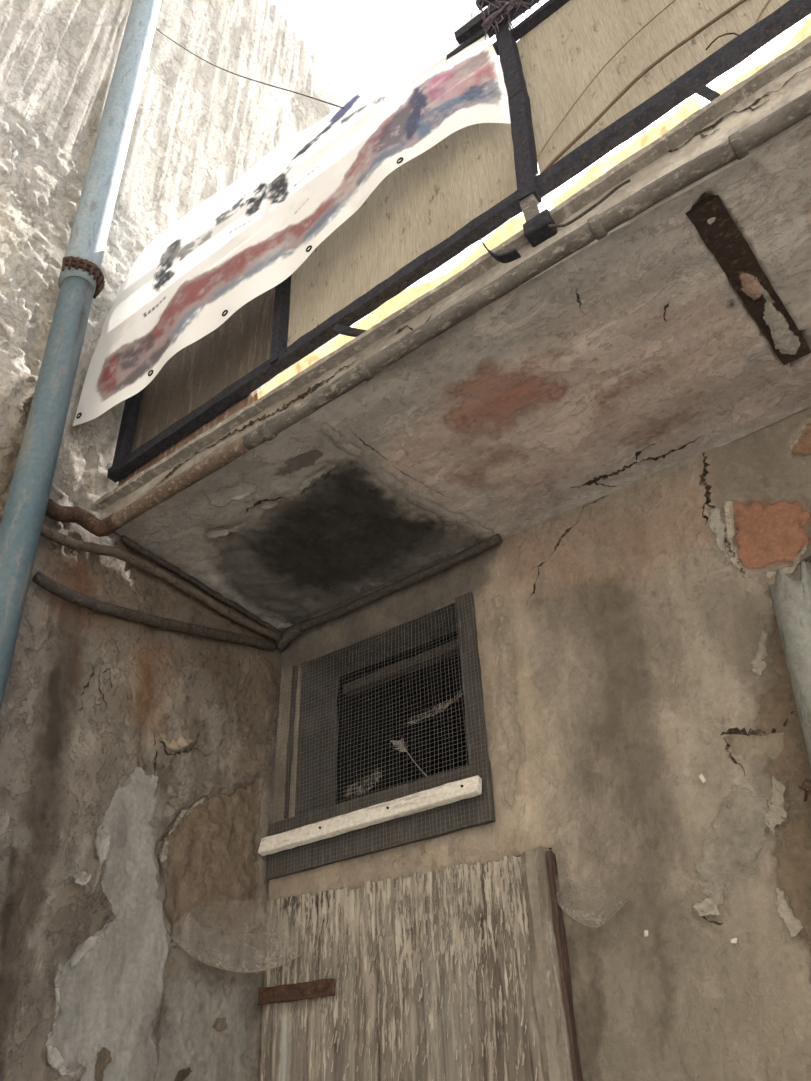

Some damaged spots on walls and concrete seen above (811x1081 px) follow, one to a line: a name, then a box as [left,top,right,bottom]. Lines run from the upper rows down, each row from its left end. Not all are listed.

water stain [204,462,475,624]
crack [527,436,745,604]
flaking render [723,501,810,597]
flaking render [692,612,811,953]
peeling [45,767,169,1081]
flaking render [174,1067,191,1081]